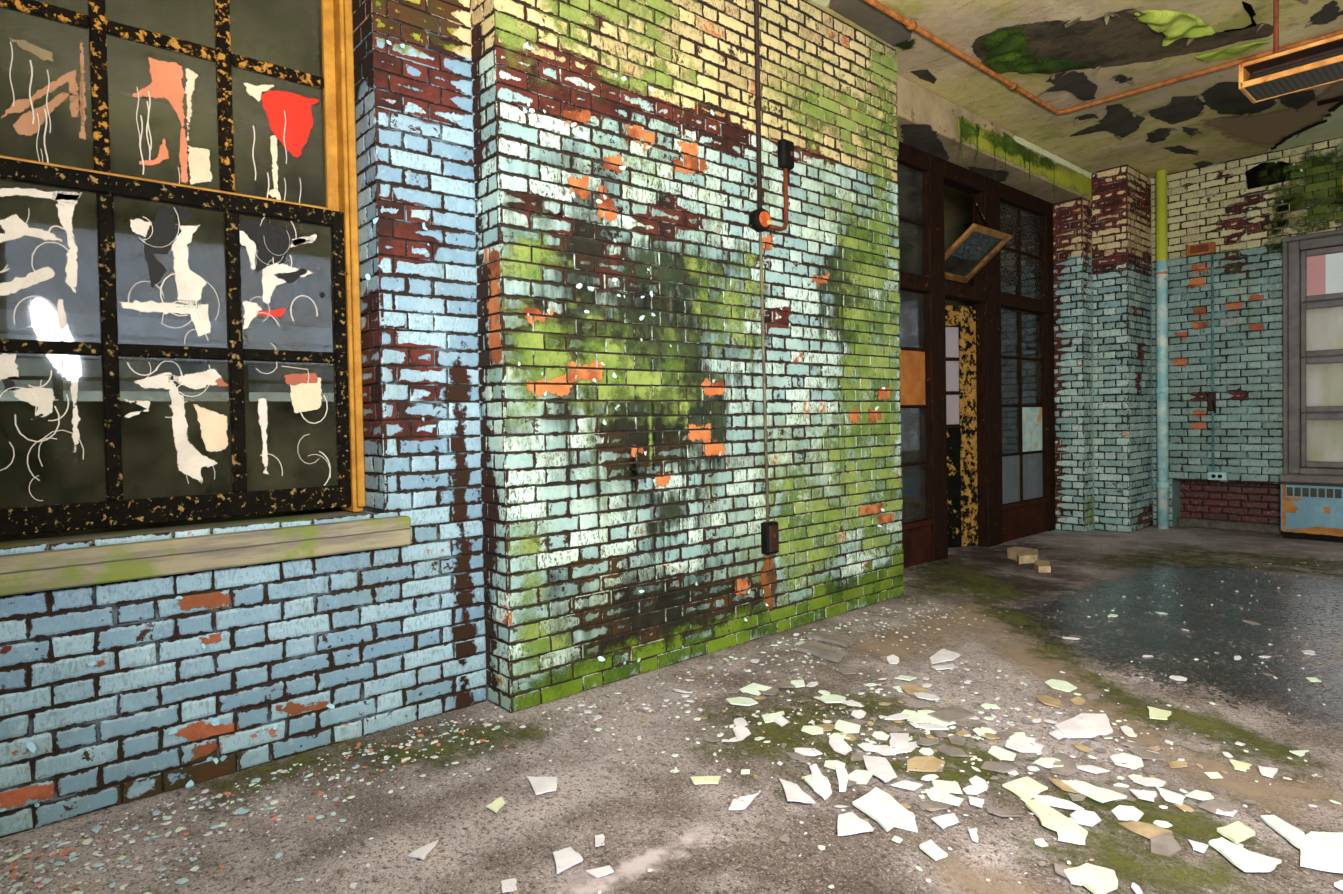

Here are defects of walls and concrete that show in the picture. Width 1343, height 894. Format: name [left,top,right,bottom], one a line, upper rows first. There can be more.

spalling [911,69,937,84]
flaking render [900,124,950,161]
spalling [968,9,1343,288]
leakage [817,220,877,370]
peeling [1013,135,1151,525]
leakage [507,174,756,663]
spalling [849,386,890,423]
spalling [1190,391,1209,431]
spalling [1228,389,1249,401]
peeling [0,0,836,894]
spalling [859,503,894,527]
rust [1282,484,1343,537]